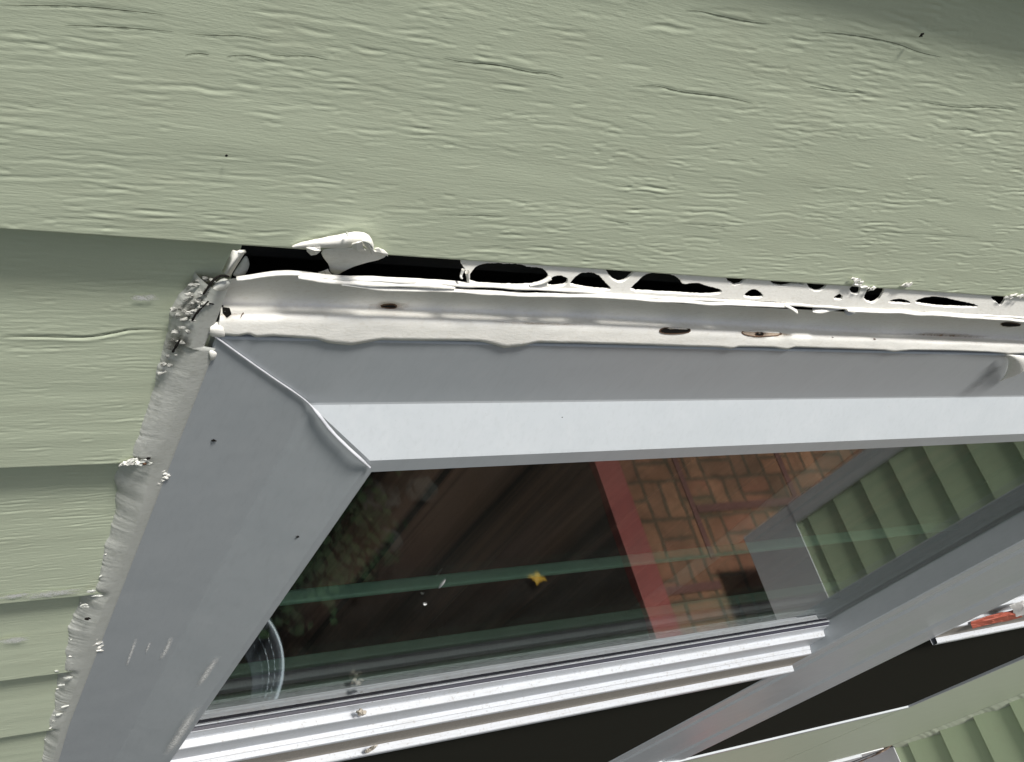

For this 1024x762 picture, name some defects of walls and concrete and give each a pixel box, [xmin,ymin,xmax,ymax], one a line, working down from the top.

peeling [306,247,321,256]
peeling [352,240,388,256]
peeling [212,250,249,291]
peeling [851,277,876,291]
peeling [812,308,856,316]